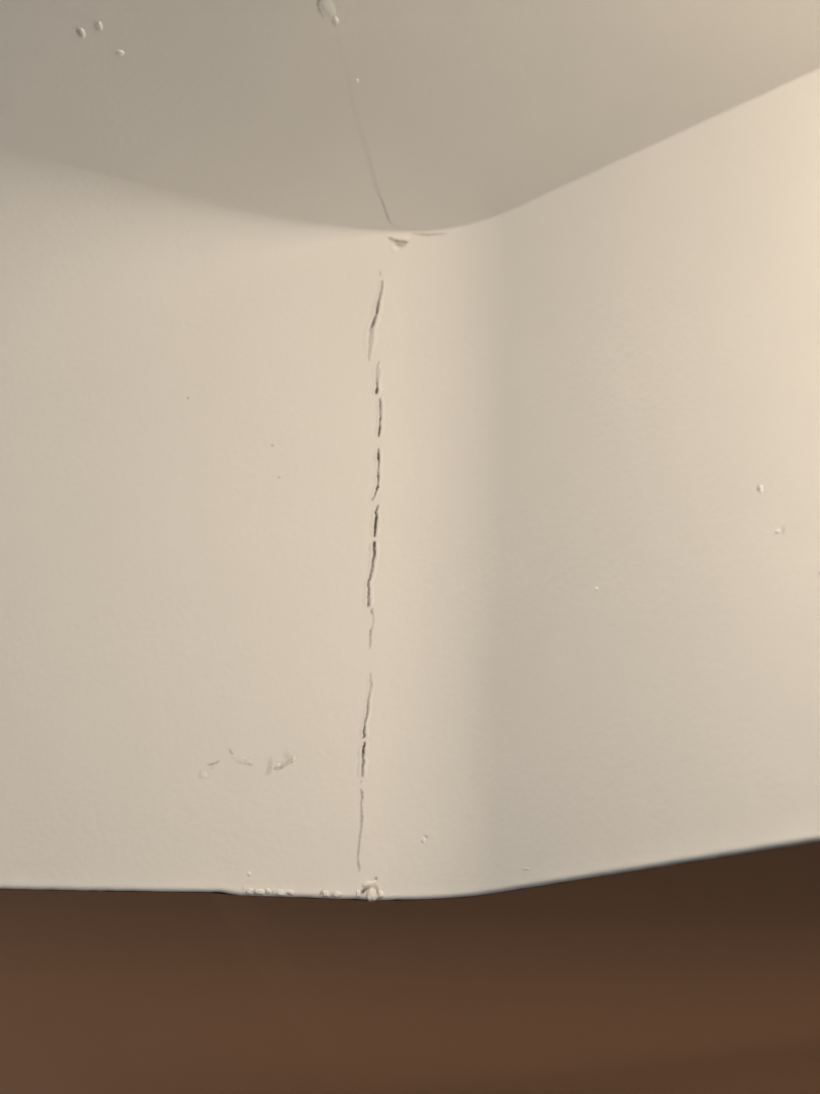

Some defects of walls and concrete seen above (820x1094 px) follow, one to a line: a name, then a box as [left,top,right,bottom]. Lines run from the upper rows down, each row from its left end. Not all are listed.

crack [362,280,387,607]
crack [357,675,375,778]